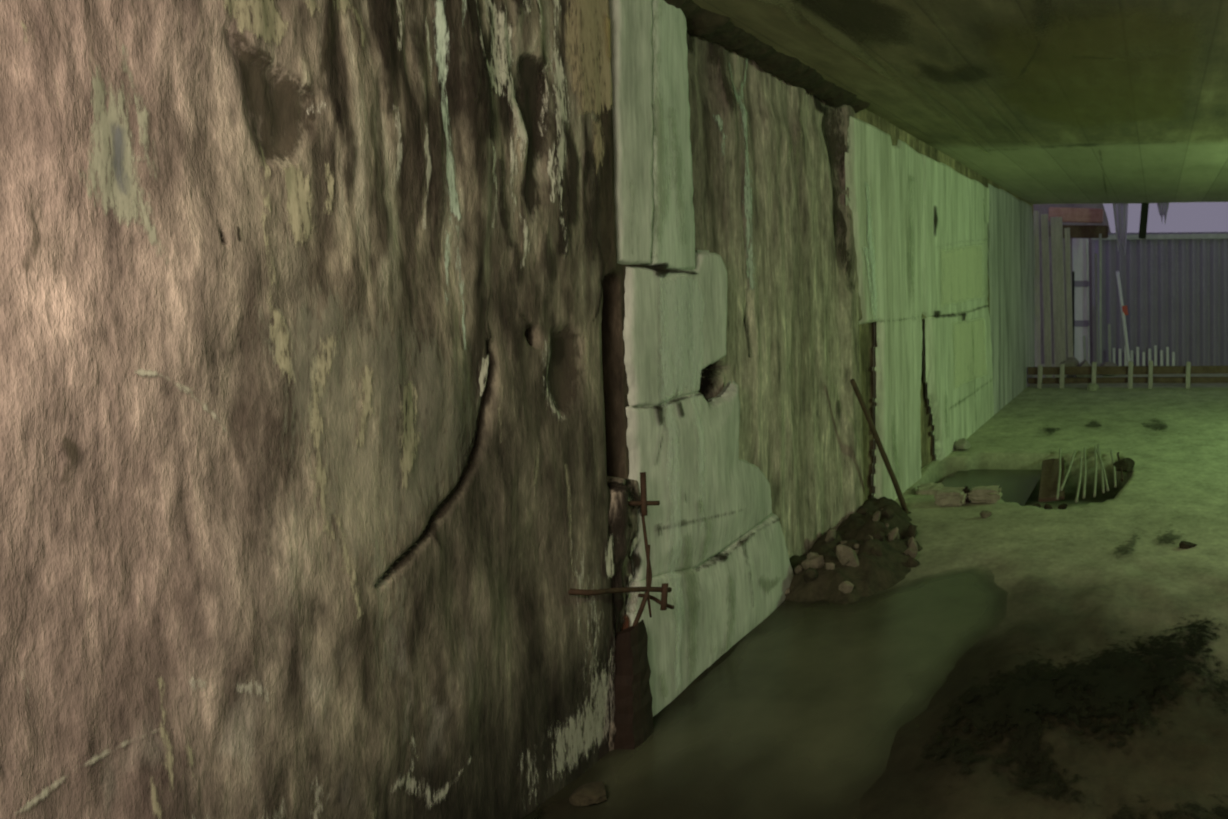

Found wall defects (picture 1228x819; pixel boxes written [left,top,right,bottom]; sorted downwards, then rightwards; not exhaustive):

damp [729,60,755,289]
spalling [814,95,855,288]
crack [374,299,495,586]